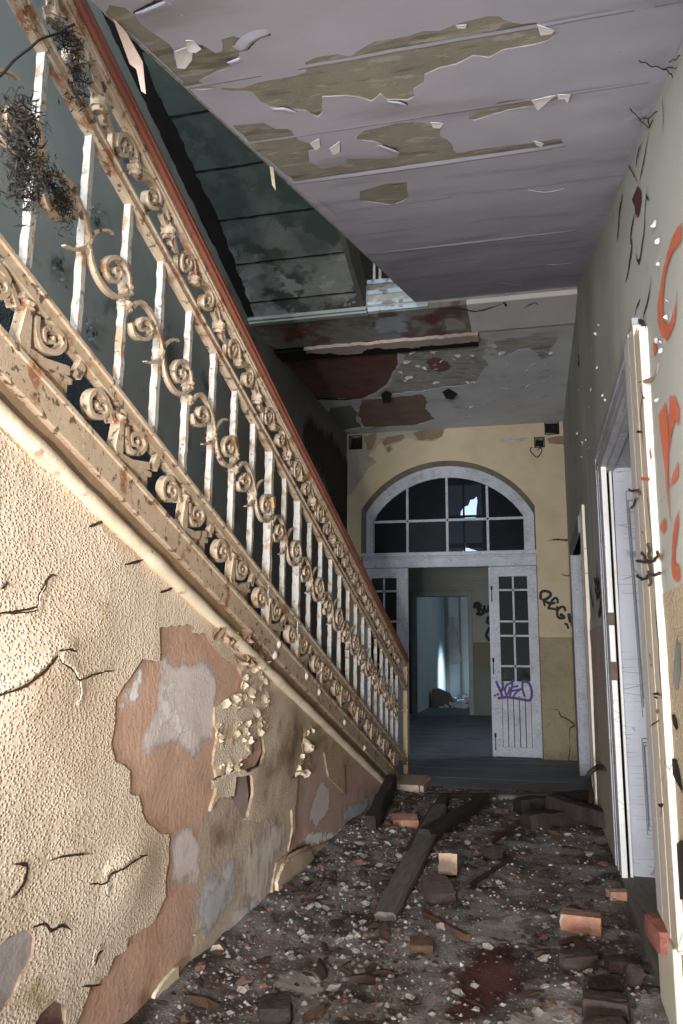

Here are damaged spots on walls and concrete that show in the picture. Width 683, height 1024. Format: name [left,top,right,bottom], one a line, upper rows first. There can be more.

peeling [104,5,556,116]
peeling [469,94,570,120]
peeling [360,182,408,204]
peeling [234,121,563,190]
crack [617,132,651,317]
peeling [304,332,564,496]
crack [0,573,57,625]
crack [0,635,114,709]
crack [551,709,575,760]
spalling [77,625,382,1024]
crack [9,843,148,933]
spalling [0,930,33,1008]